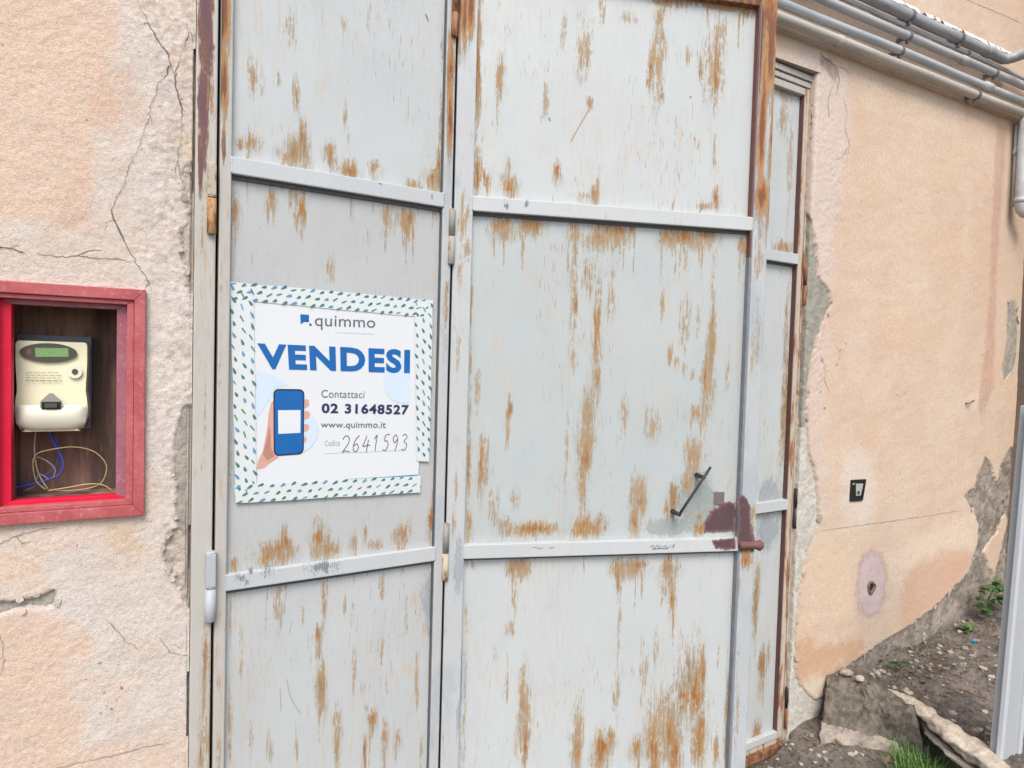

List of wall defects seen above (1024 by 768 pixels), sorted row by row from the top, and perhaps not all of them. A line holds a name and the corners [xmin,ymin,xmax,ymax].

crack [0,0,193,290]
corrosion [197,0,260,196]
corrosion [407,0,482,192]
corrosion [646,0,794,278]
crack [821,54,850,160]
spalling [0,590,61,615]
corrosion [445,193,557,543]
corrosion [566,223,636,539]
corrosion [633,626,739,768]
spalling [781,215,831,744]
spalling [850,448,1012,666]
flaking render [1002,299,1021,380]